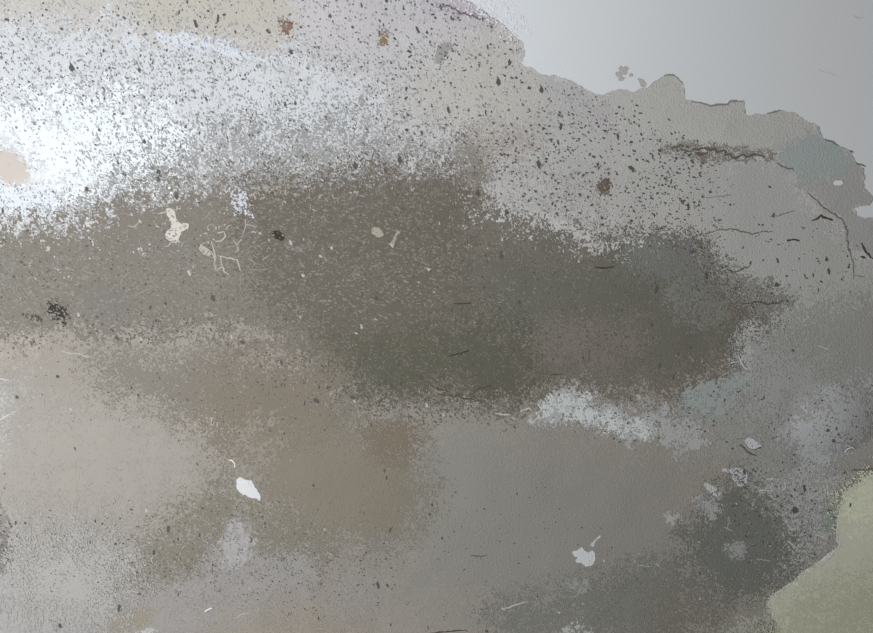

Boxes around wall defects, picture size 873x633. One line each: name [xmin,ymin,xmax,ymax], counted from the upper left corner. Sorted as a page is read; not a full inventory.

crack [671,144,794,171]
crack [705,193,873,277]